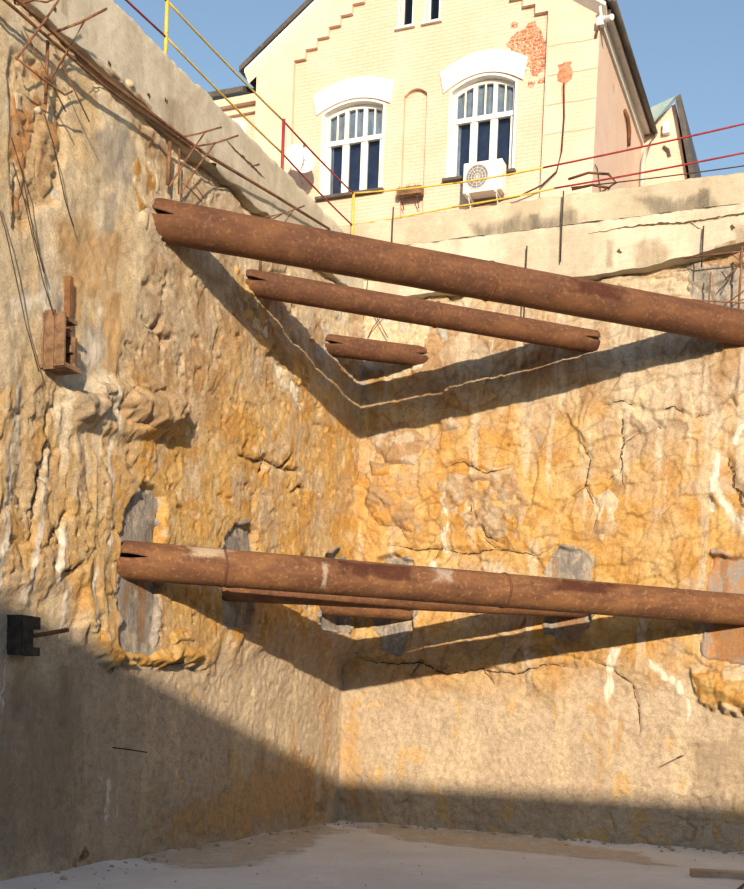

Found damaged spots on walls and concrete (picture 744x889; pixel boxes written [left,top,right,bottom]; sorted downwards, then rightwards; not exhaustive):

peeling [506,21,547,88]
leakage [0,384,22,589]
leakage [20,449,50,605]
leakage [55,528,68,639]
leakage [92,567,100,632]
leakage [106,384,123,554]